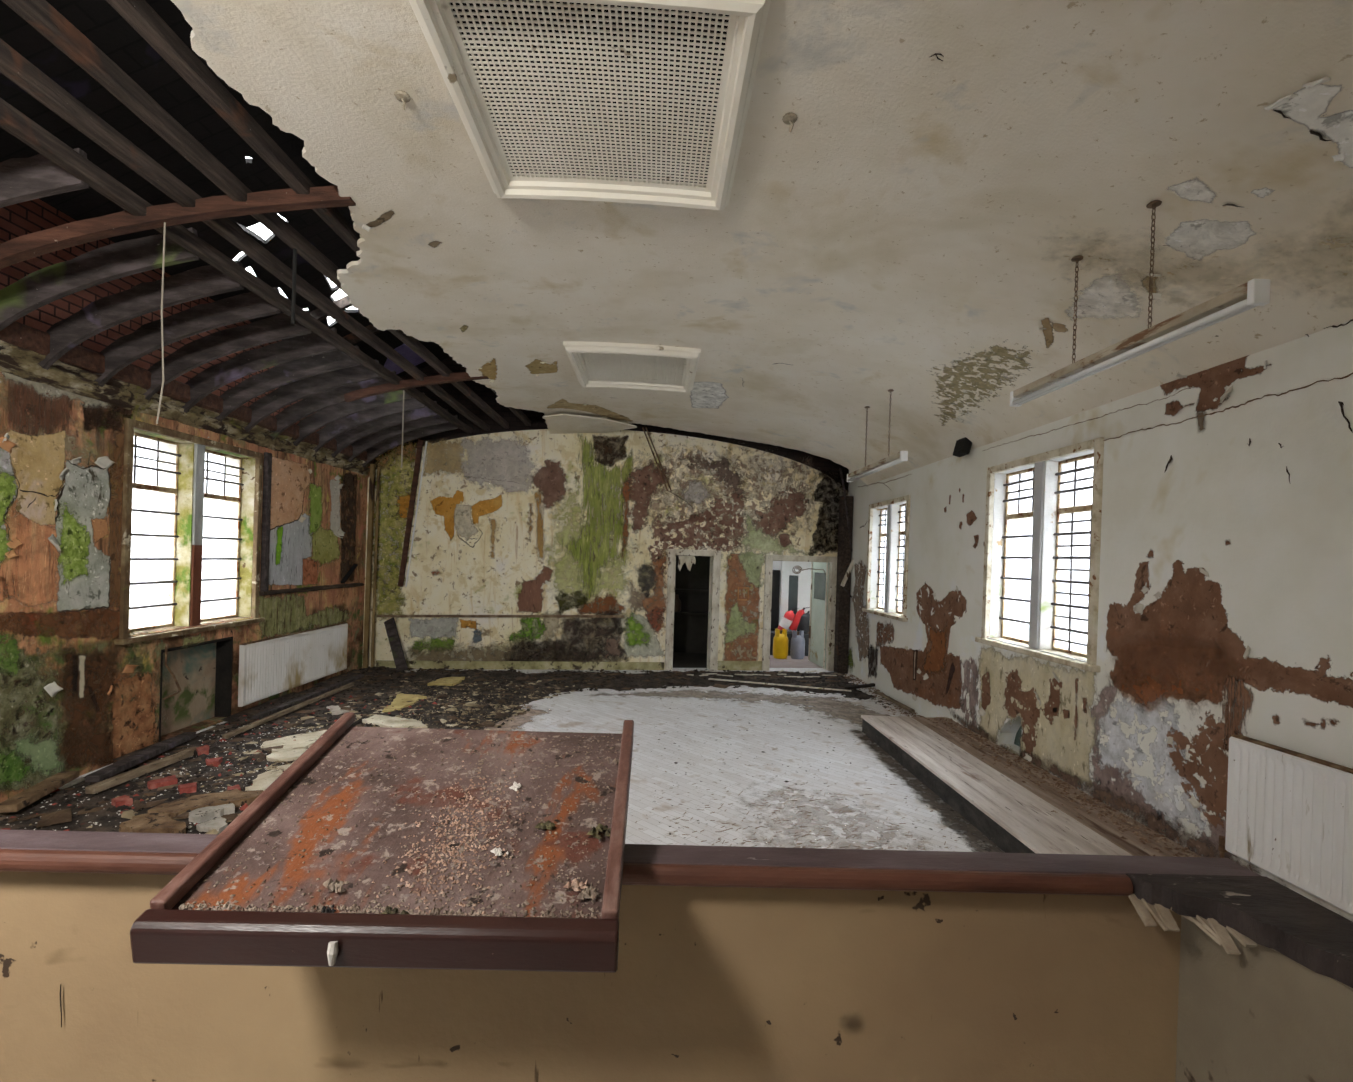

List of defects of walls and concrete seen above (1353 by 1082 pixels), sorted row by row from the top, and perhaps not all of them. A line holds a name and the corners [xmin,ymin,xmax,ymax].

peeling [0,433,23,579]
flaking render [2,372,108,407]
leakage [0,379,163,769]
flaking render [430,437,535,539]
peeling [517,566,561,637]
leakage [593,435,629,467]
peeling [625,456,809,593]
peeling [878,583,967,711]
peeling [978,670,1087,761]
crack [984,372,1353,472]
peeling [1160,355,1272,416]
peeling [1105,549,1353,830]